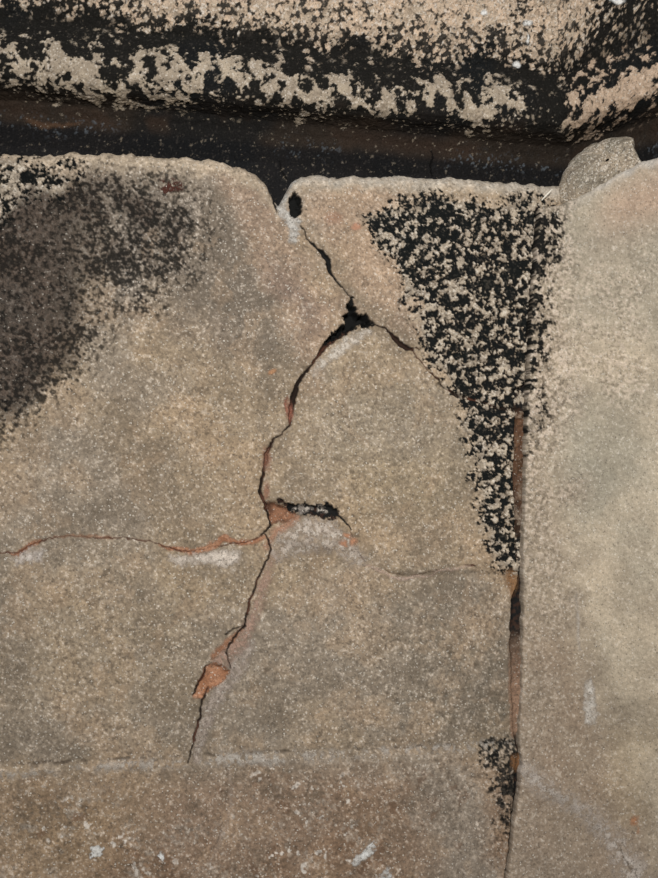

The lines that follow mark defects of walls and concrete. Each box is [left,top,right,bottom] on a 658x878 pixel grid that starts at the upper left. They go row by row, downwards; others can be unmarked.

damp [0,155,89,224]
crack [109,161,527,668]
damp [15,551,42,564]
crack [6,536,56,556]
spalling [193,498,366,762]
crack [187,665,209,763]
crack [506,734,518,859]